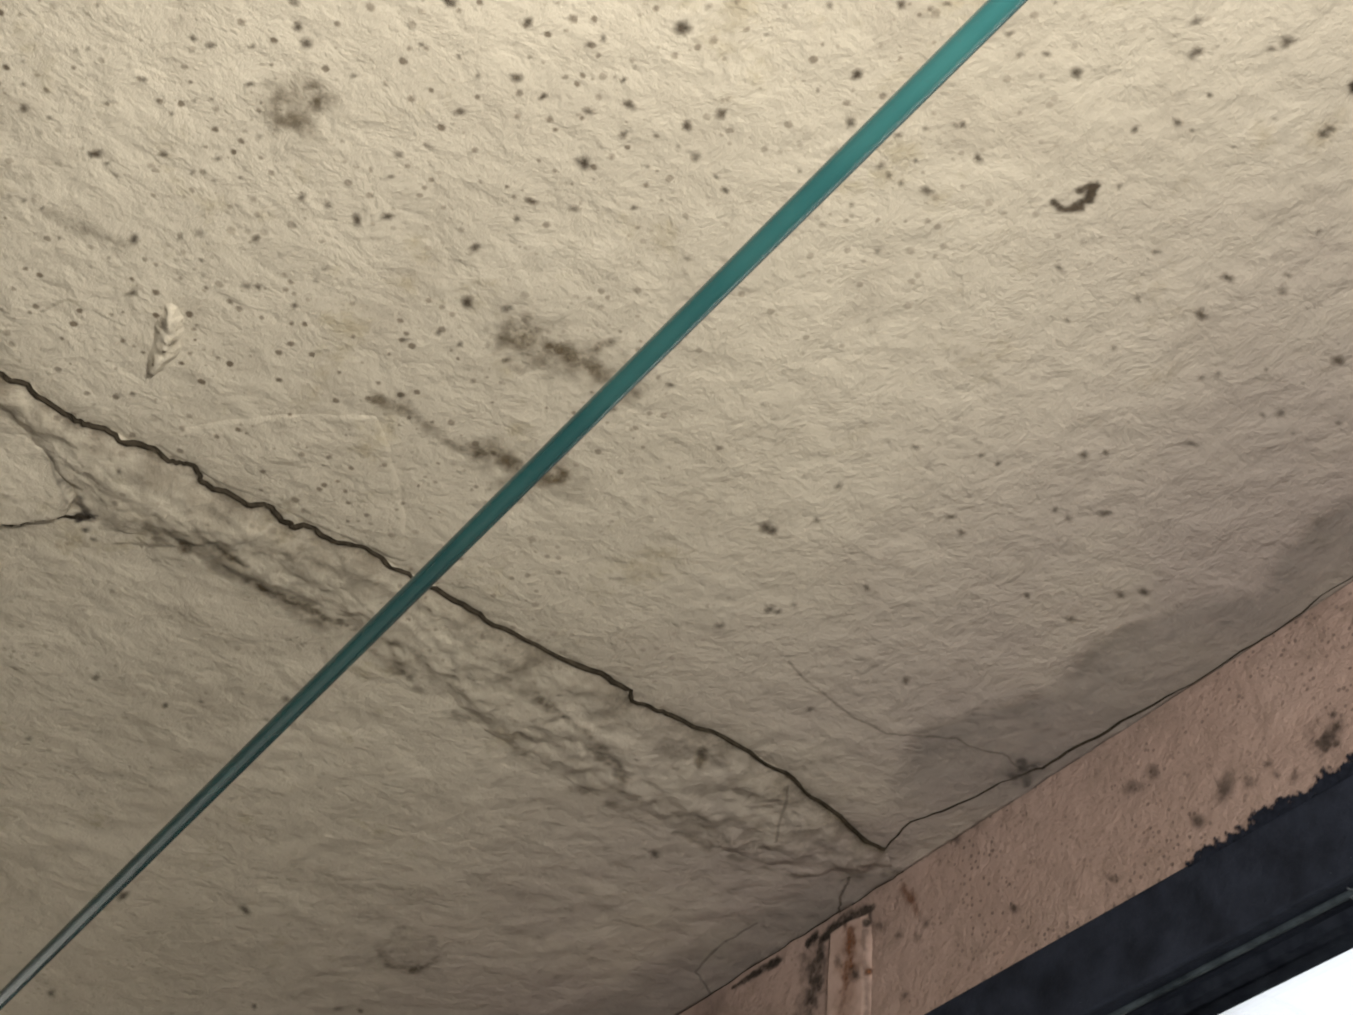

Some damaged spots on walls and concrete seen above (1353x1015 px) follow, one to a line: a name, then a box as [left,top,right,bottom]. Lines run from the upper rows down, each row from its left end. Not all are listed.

damp [500,332,612,380]
flaking render [0,433,96,540]
damp [474,446,519,469]
damp [539,466,568,484]
crack [0,371,1353,1015]
damp [1316,713,1339,751]
damp [805,905,873,1014]